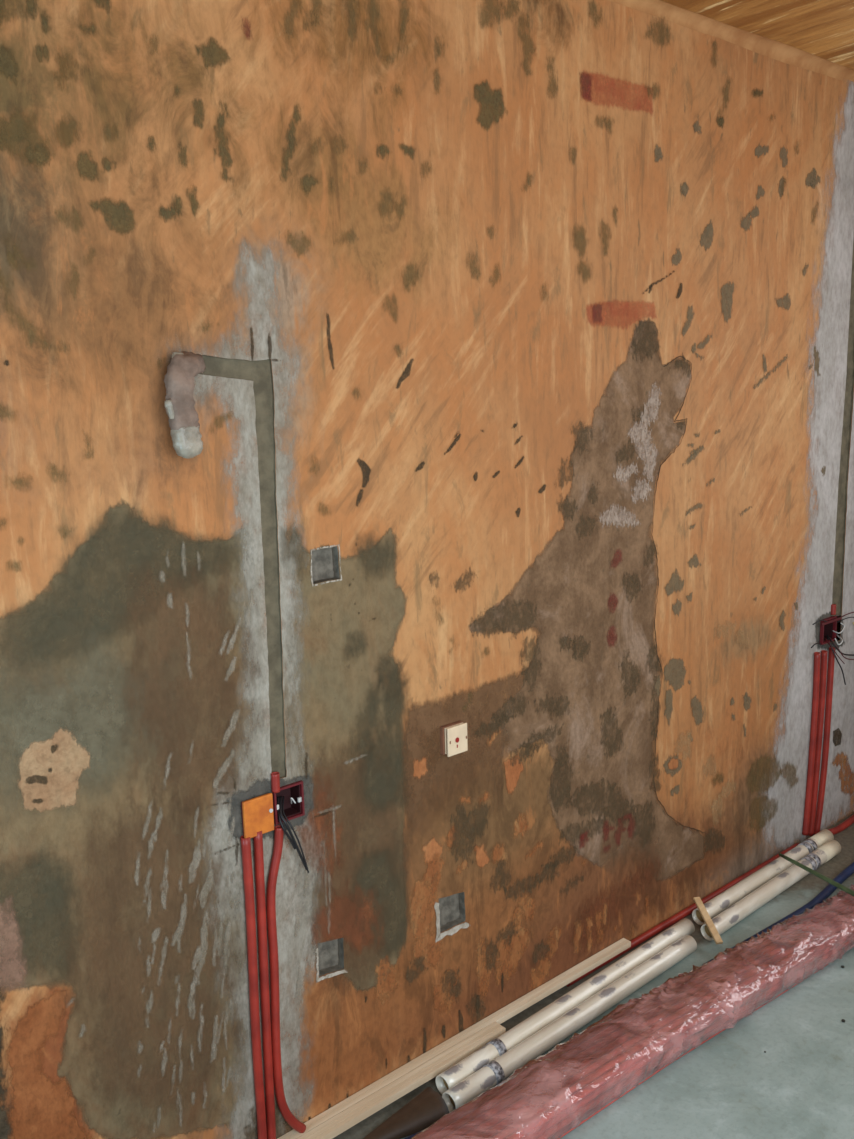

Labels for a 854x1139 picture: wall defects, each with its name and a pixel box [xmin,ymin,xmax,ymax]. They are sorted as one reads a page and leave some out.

leakage [196,38,229,68]
leakage [77,153,116,181]
leakage [194,99,233,182]
leakage [280,106,301,180]
leakage [361,144,430,174]
leakage [91,199,135,234]
leakage [159,188,199,220]
leakage [574,227,590,280]
leakage [213,713,238,788]
peeling [0,501,258,1139]
leakage [747,757,798,828]
leakage [135,806,233,1091]